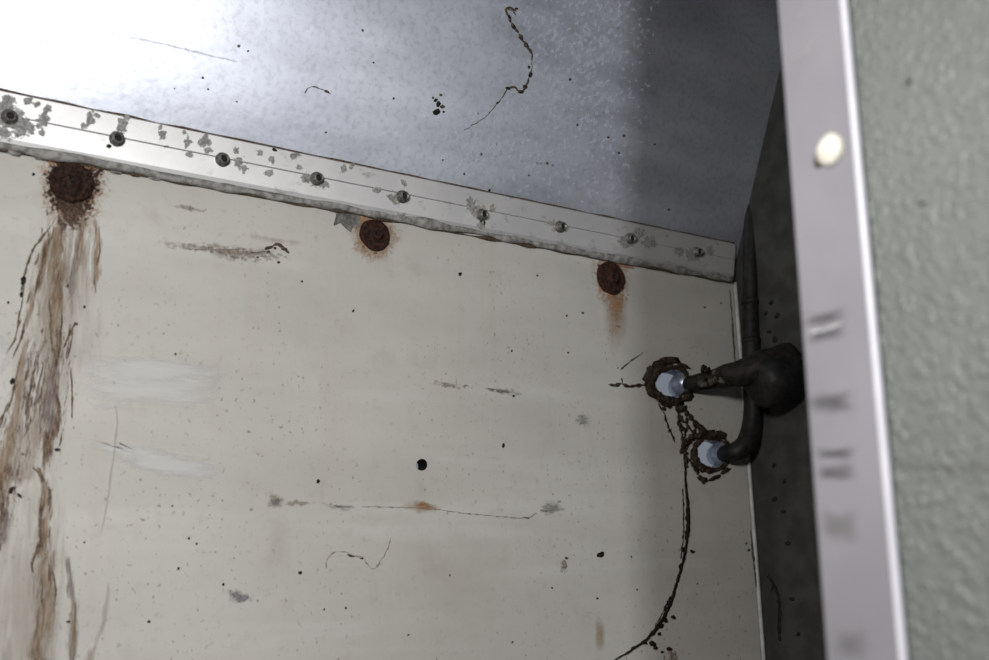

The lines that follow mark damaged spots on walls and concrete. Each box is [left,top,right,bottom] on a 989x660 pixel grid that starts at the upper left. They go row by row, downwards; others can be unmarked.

corrosion [0,160,104,660]
corrosion [372,179,407,218]